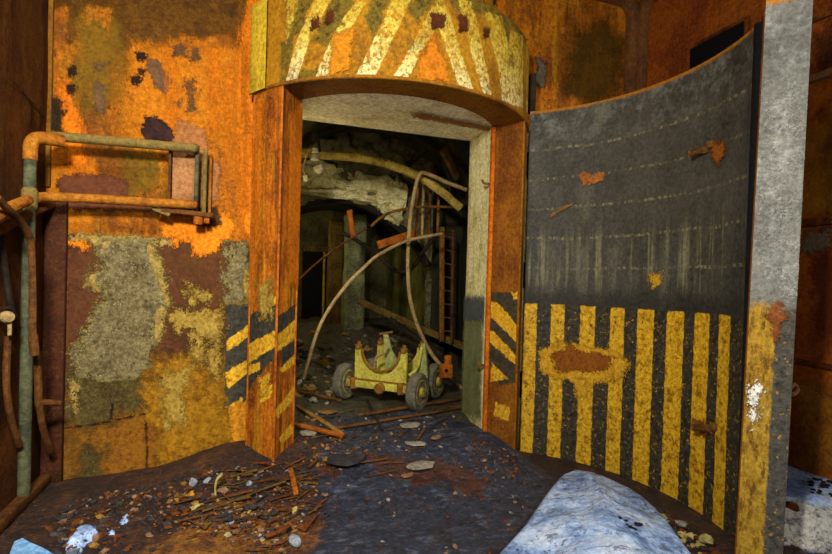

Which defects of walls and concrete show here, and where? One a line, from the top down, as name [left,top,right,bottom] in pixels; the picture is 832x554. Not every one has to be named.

corrosion [309,7,336,31]
corrosion [429,11,448,30]
corrosion [458,14,469,32]
peeling [129,50,172,94]
corrosion [56,74,97,177]
corrosion [113,0,264,287]
corrosion [287,104,303,288]
corrosion [578,171,605,186]
spalling [65,99,276,386]
peeling [257,372,272,397]
corrosion [534,340,631,400]
peeling [223,397,246,442]